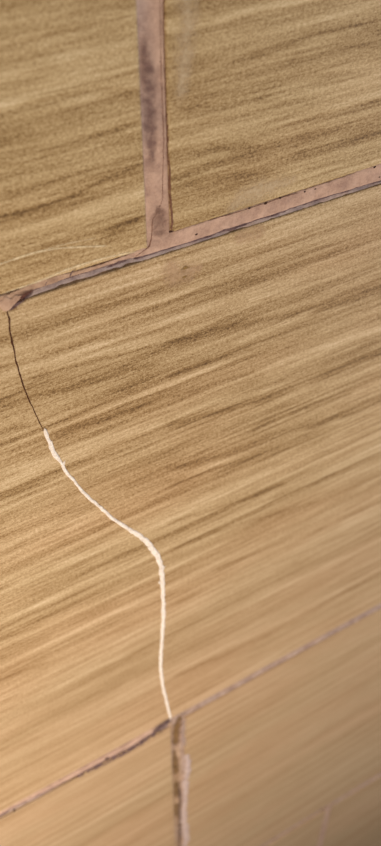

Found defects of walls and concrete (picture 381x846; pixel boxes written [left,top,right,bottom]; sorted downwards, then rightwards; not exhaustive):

crack [55,0,381,283]
crack [0,282,171,816]